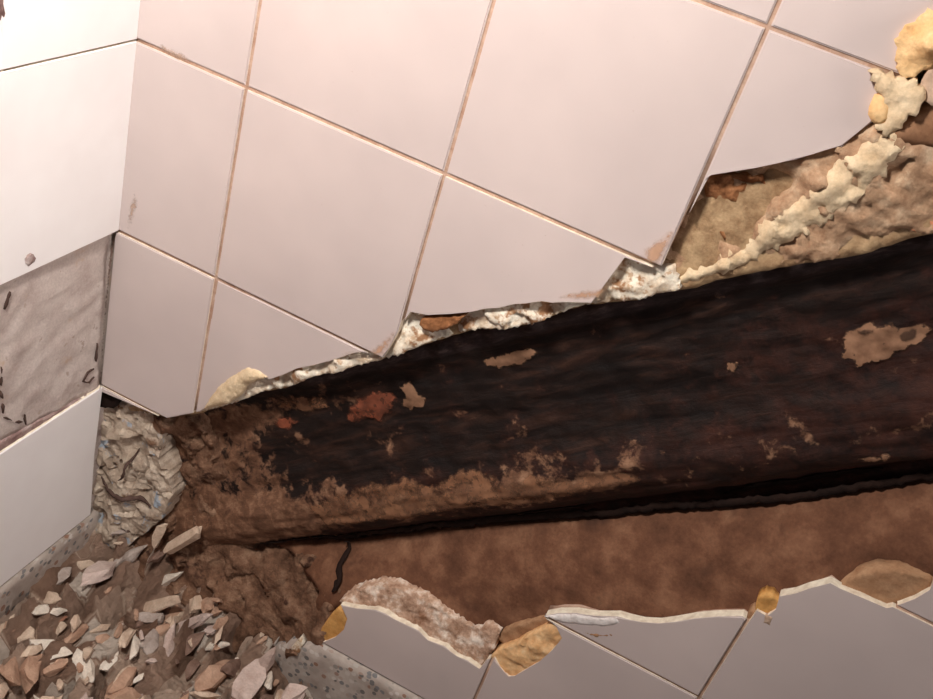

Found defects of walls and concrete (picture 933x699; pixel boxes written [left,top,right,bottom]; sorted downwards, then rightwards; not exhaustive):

peeling [0,235,109,451]
rust [268,395,329,429]
rust [347,383,426,422]
spalling [92,101,933,676]
crack [101,448,151,506]